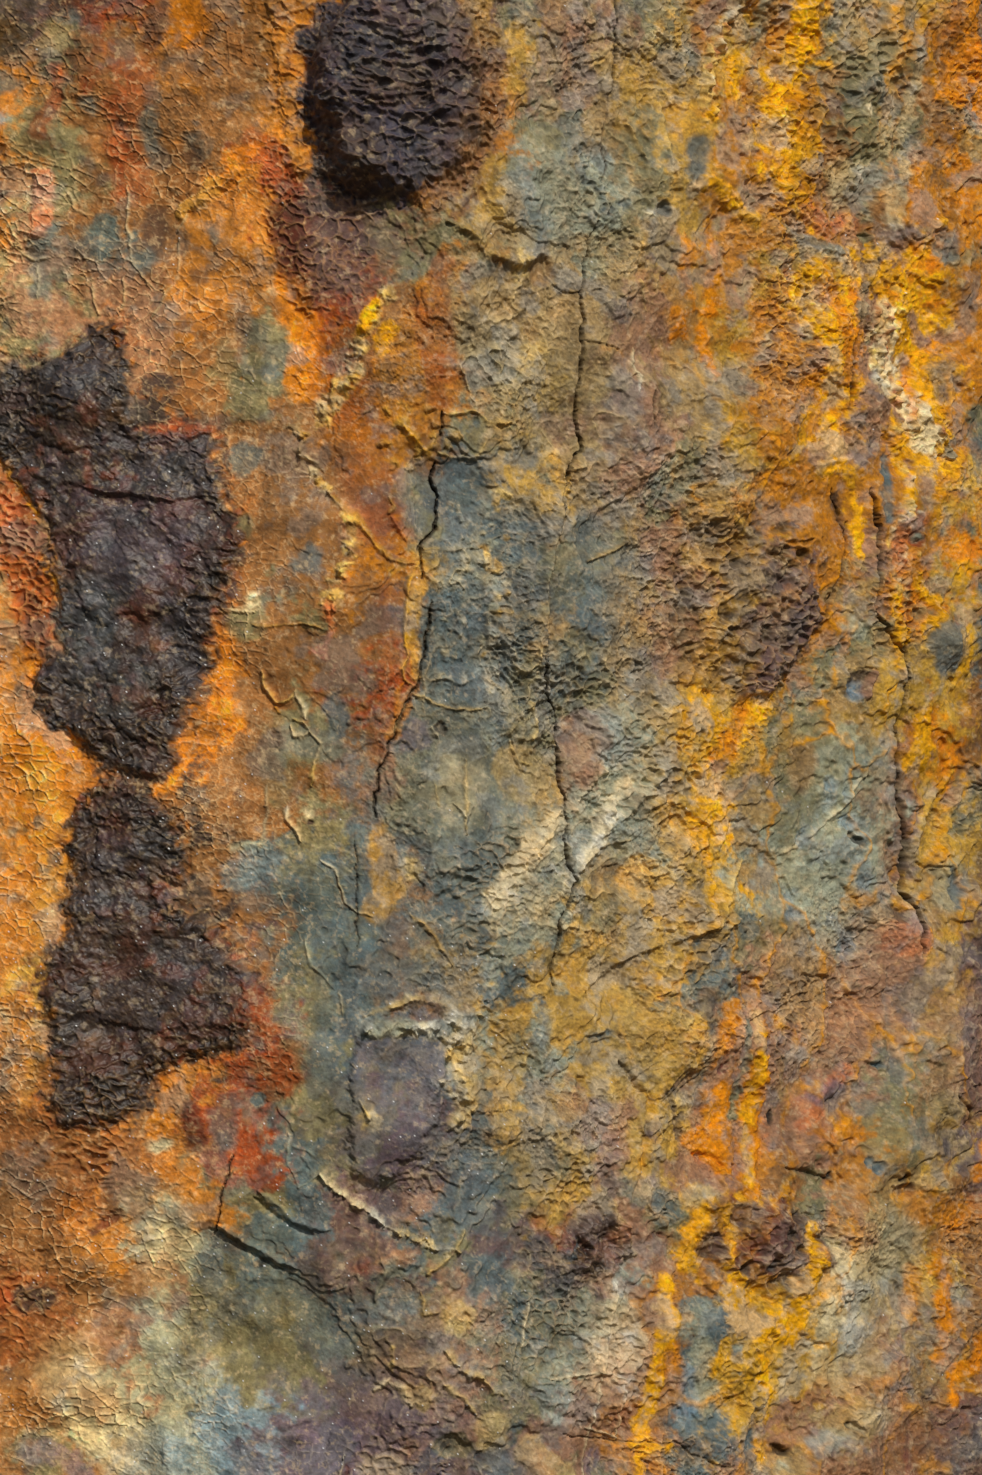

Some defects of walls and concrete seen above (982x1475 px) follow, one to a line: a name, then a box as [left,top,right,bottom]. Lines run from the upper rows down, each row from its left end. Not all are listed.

crack [598,0,621,183]
corrosion [723,0,834,164]
corrosion [660,223,742,381]
corrosion [786,254,868,561]
crack [334,411,446,949]
crack [543,219,622,989]
crack [824,486,932,961]
corrosion [681,998,779,1203]
corrosion [0,1257,79,1371]
corrosion [628,1273,694,1475]
corrosion [717,1220,832,1422]
corrosion [920,1241,982,1409]